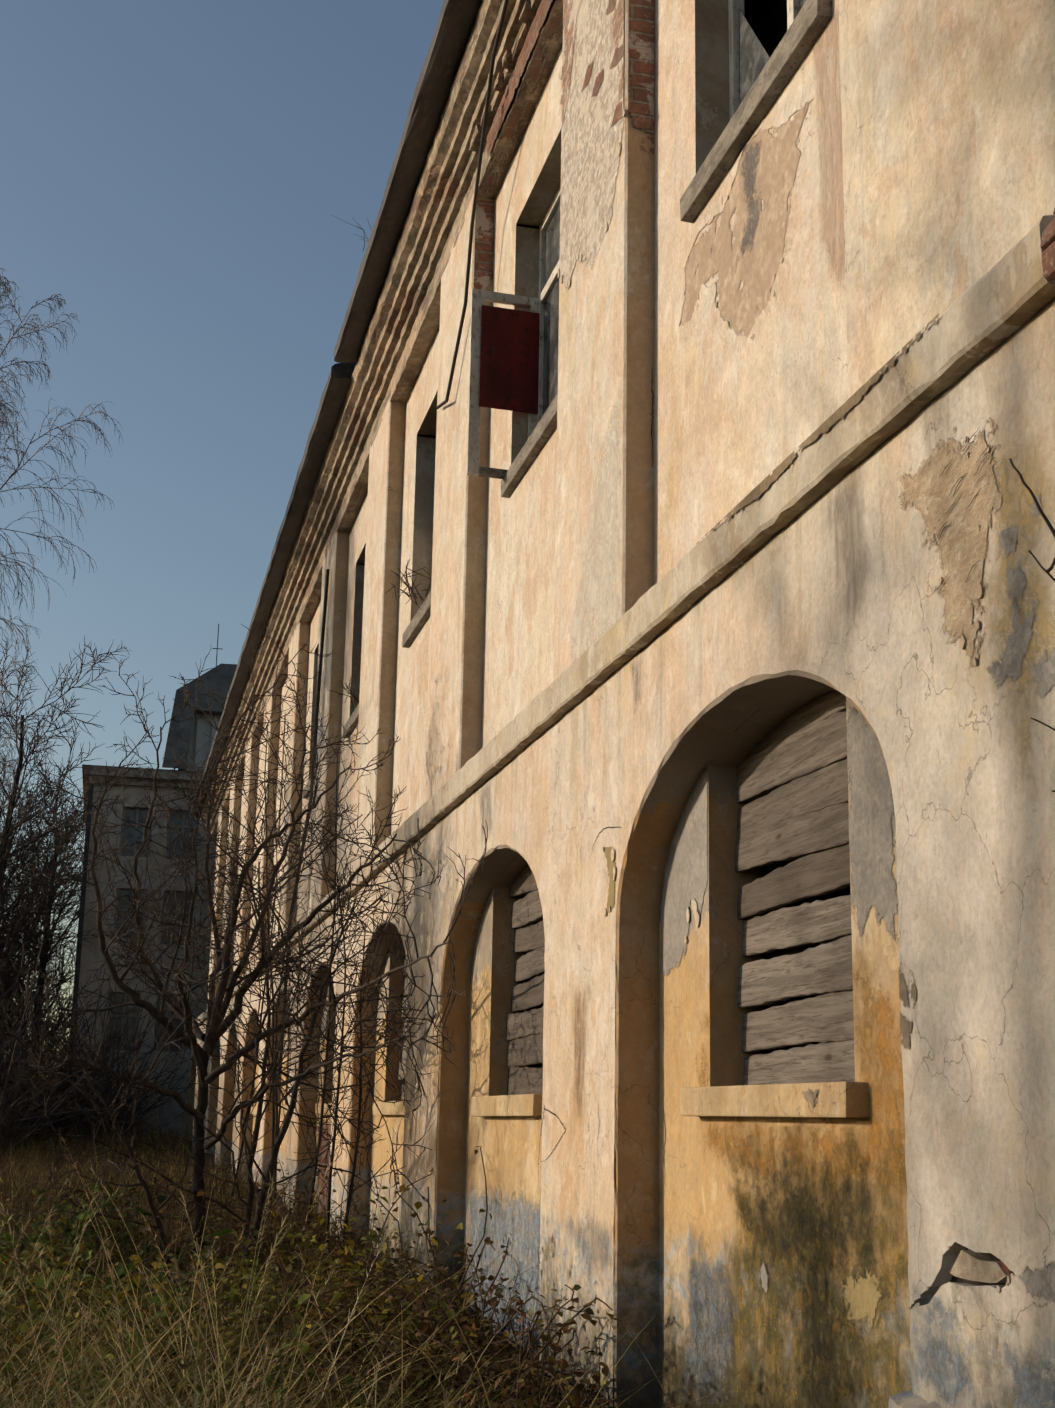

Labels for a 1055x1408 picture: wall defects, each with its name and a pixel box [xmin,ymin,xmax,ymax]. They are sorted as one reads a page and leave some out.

peeling [470,0,655,290]
peeling [674,80,819,358]
flaking render [1040,208,1055,280]
spalling [899,417,1055,698]
peeling [660,769,707,976]
leakage [661,973,906,1408]
spalling [1013,1242,1055,1323]